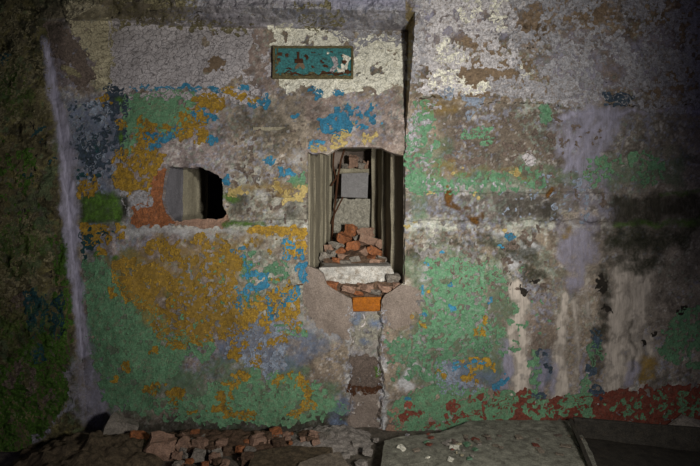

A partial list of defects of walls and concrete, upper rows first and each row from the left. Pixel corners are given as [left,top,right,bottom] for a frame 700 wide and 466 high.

leakage [0,0,317,374]
peeling [78,214,350,466]
peeling [43,0,700,241]
peeling [345,150,700,431]
leakage [484,233,590,399]